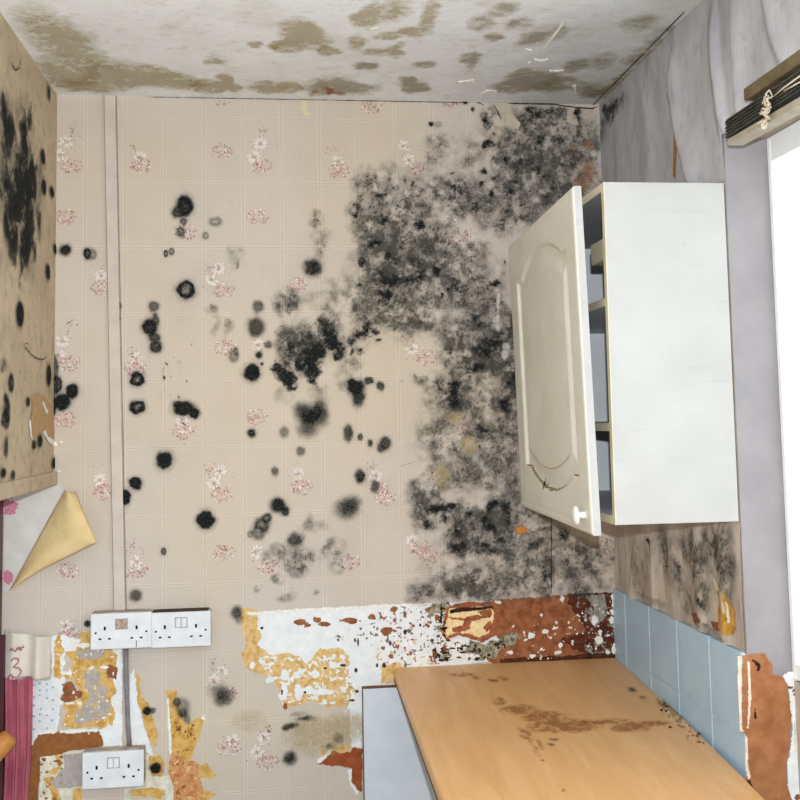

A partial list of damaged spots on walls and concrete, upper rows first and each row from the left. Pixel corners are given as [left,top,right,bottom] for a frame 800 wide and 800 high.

damp [0,92,54,285]
damp [172,195,194,237]
damp [142,301,162,353]
damp [243,61,627,662]
flaking render [29,392,55,446]
damp [173,397,201,419]
damp [156,452,173,470]
damp [123,477,142,505]
damp [196,511,216,529]
flaking render [249,592,616,795]
flaking render [28,648,118,800]
flaking render [737,653,800,800]